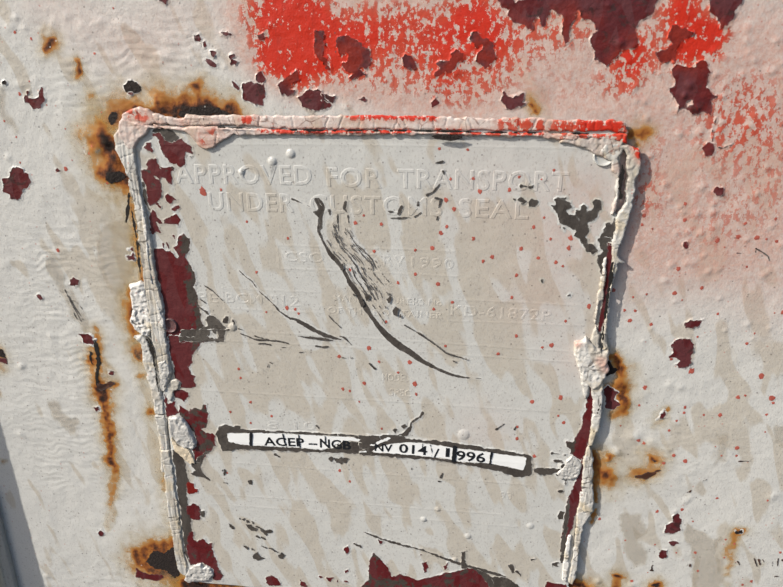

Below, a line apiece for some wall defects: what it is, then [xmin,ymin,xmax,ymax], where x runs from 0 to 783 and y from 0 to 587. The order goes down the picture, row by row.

peeling [191,30,338,113]
peeling [496,0,660,68]
peeling [652,20,733,158]
peeling [0,164,34,202]
rust [76,77,243,282]
peeling [511,182,616,334]
rust [85,326,120,507]
rust [121,287,143,363]
peeling [135,124,593,587]
rust [604,352,632,420]
peeling [666,317,705,370]
rust [126,536,245,587]